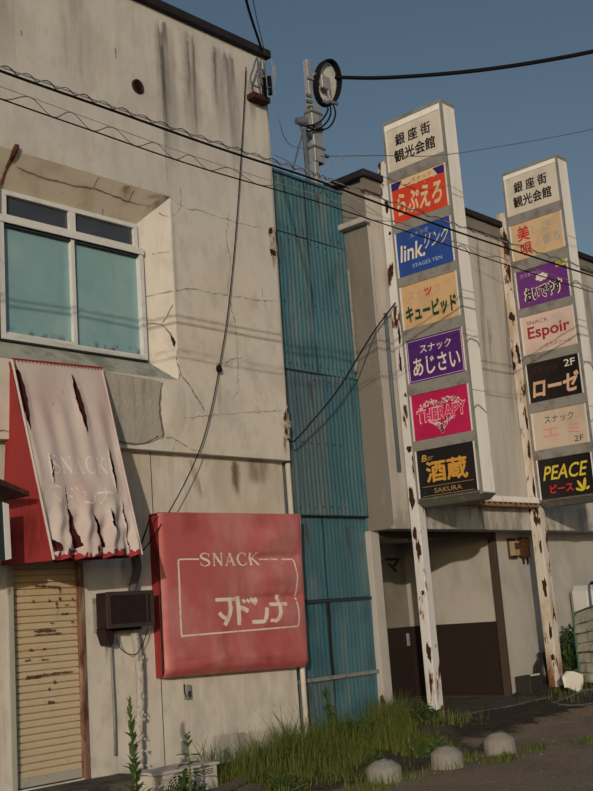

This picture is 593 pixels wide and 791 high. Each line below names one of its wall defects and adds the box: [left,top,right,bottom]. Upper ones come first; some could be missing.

rust [1,144,19,184]
crack [19,168,136,215]
crack [119,288,216,446]